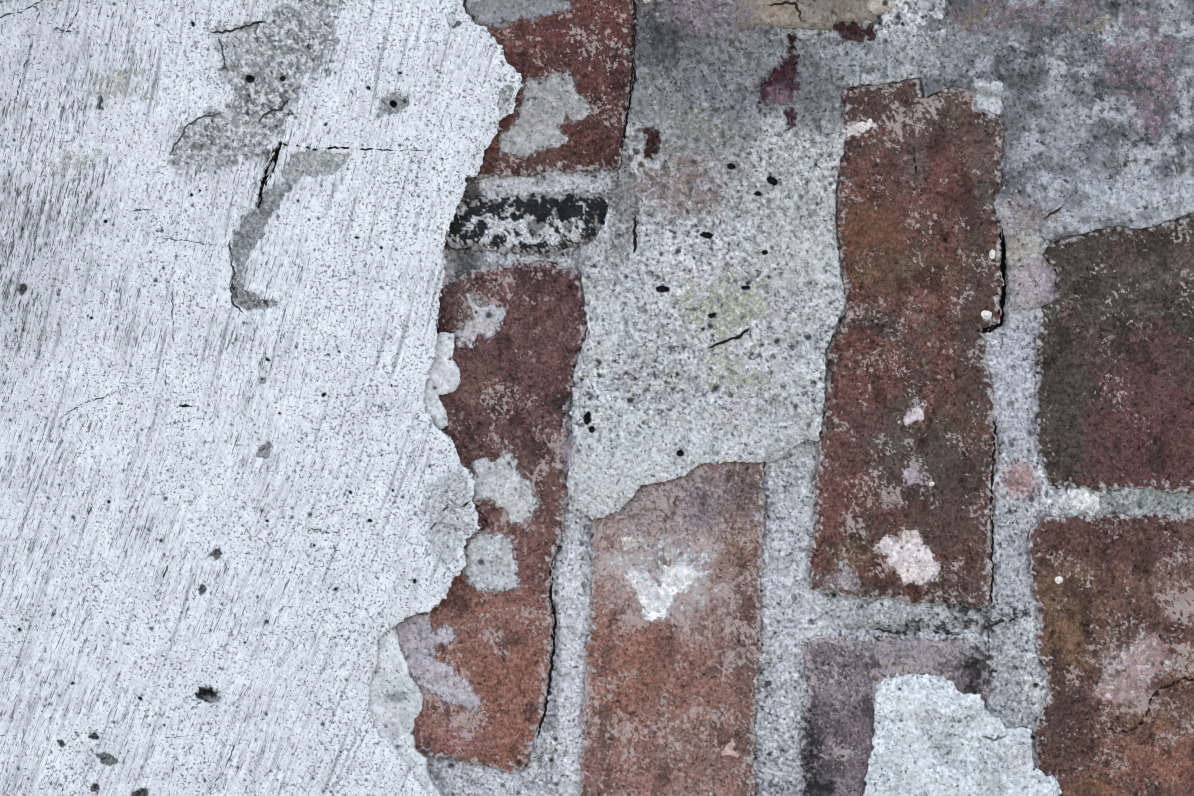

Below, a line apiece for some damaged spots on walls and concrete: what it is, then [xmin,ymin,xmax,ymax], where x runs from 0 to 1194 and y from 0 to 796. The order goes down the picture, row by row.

spalling [833,21,876,45]
spalling [377,91,409,117]
peeling [497,85,514,114]
spalling [757,33,800,130]
crack [256,142,425,208]
spalling [643,128,661,160]
flaking render [423,332,461,430]
peeling [421,473,474,573]
flaking render [369,627,445,796]